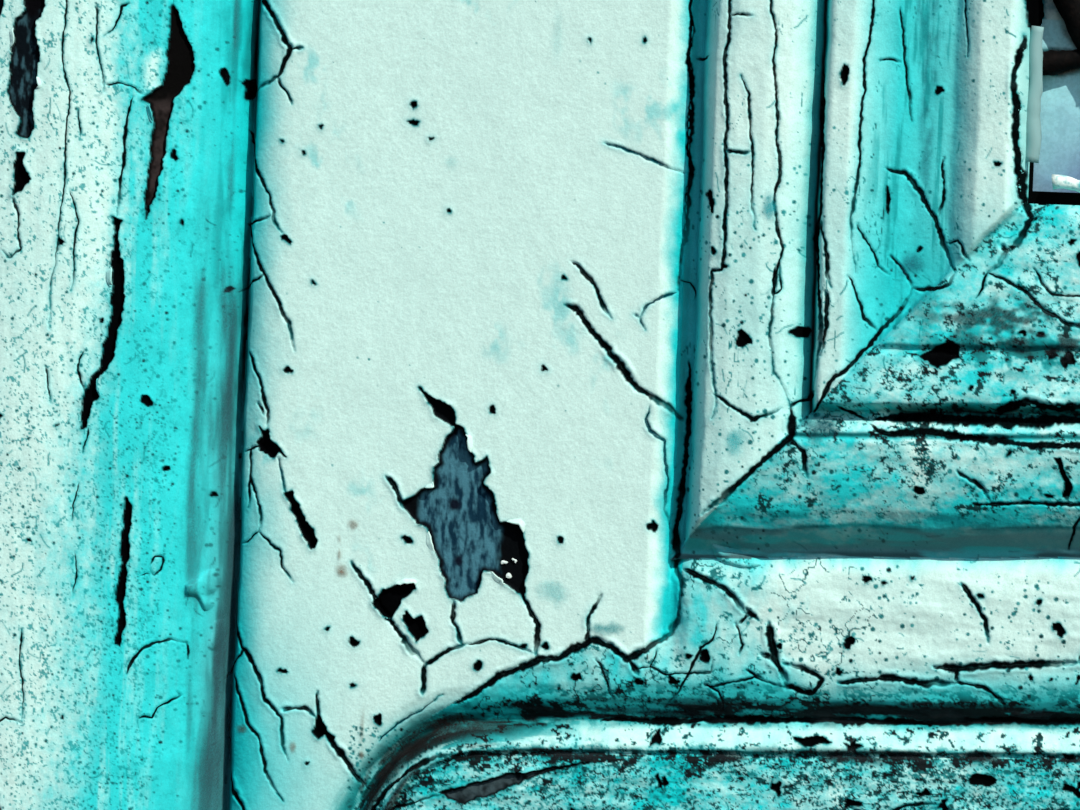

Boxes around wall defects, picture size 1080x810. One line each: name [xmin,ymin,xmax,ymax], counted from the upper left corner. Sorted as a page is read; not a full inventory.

peeling [11,152,31,196]
peeling [7,0,45,138]
peeling [142,4,195,218]
crack [252,0,300,101]
crack [352,0,1080,740]
peeling [920,340,960,368]
peeling [402,387,529,602]
peeling [372,578,428,642]
crack [229,626,440,810]